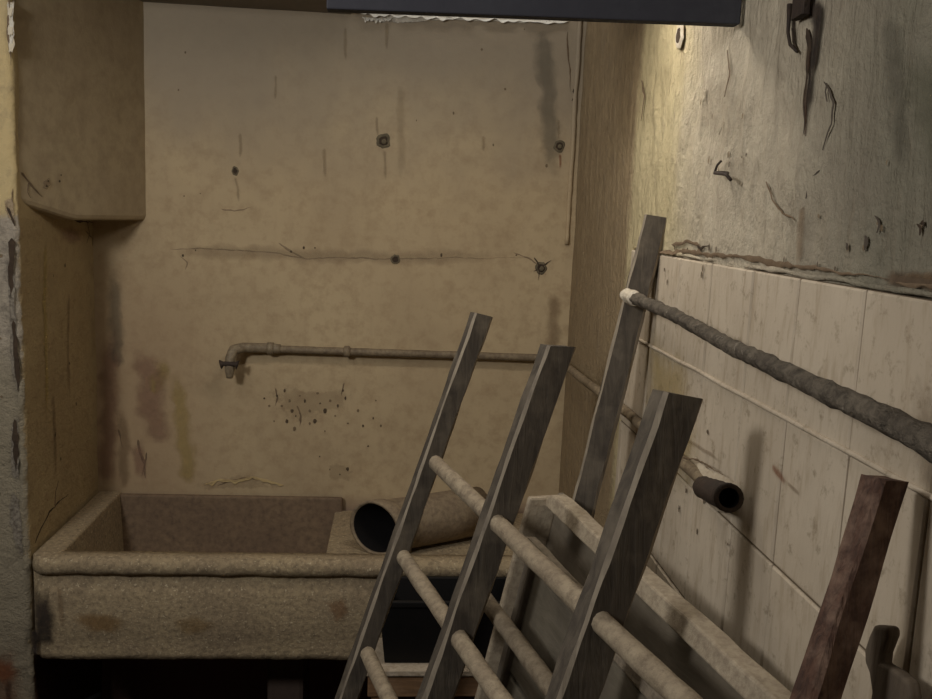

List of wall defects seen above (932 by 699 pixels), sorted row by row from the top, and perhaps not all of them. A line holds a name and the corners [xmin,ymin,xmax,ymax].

crack [791,28,835,199]
crack [174,243,546,275]